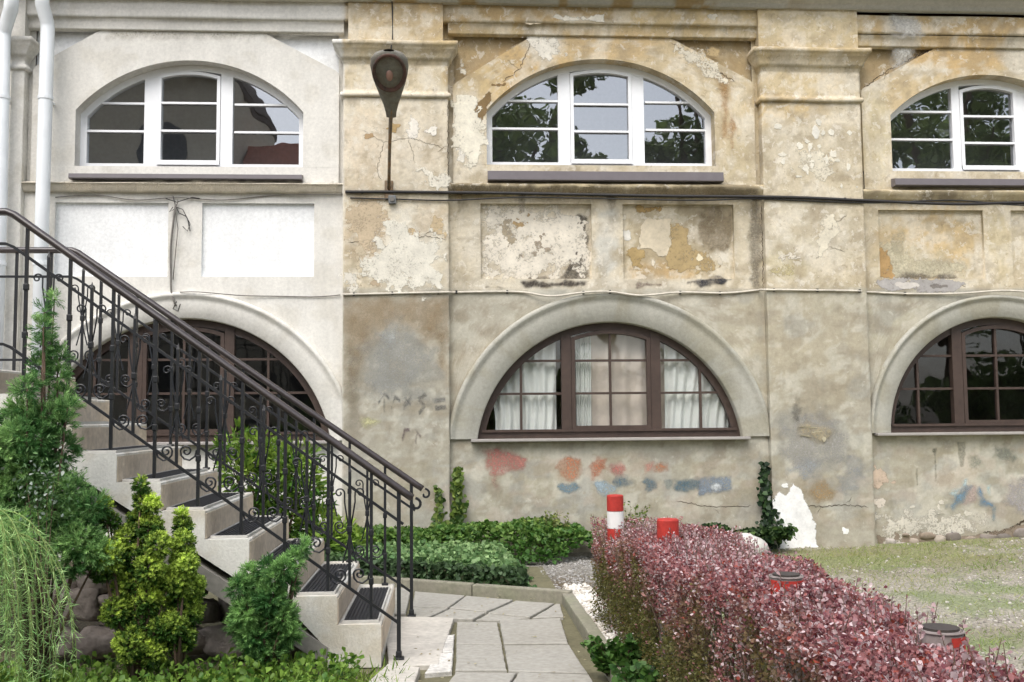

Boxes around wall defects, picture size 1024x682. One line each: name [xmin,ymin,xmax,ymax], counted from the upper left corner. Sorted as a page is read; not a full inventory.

peeling [674,44,732,84]
crack [364,106,449,187]
peeling [386,115,437,139]
peeling [416,167,452,191]
flaking render [448,83,506,169]
peeling [778,119,851,188]
peeling [340,196,447,301]
peeling [481,204,591,279]
flaking render [623,205,723,274]
flaking render [876,247,965,293]
peeling [767,483,819,549]